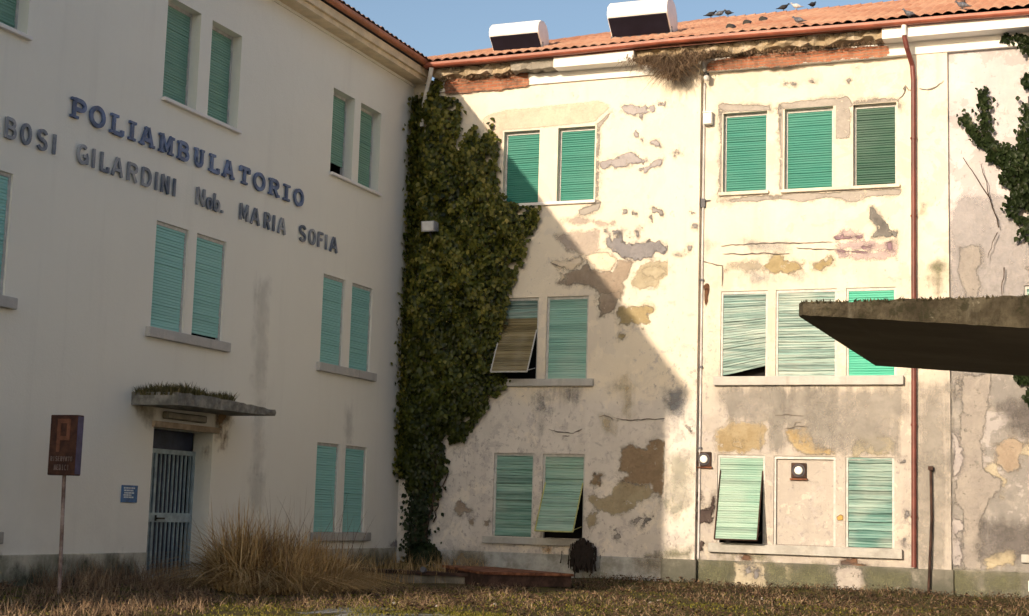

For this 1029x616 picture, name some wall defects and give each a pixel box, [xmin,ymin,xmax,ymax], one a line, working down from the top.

peeling [598,101,678,173]
spalling [557,207,692,340]
peeling [764,205,898,275]
spalling [586,439,665,528]
spalling [715,421,768,455]
spalling [951,373,1024,571]
spalling [733,554,767,587]
spalling [832,558,866,590]